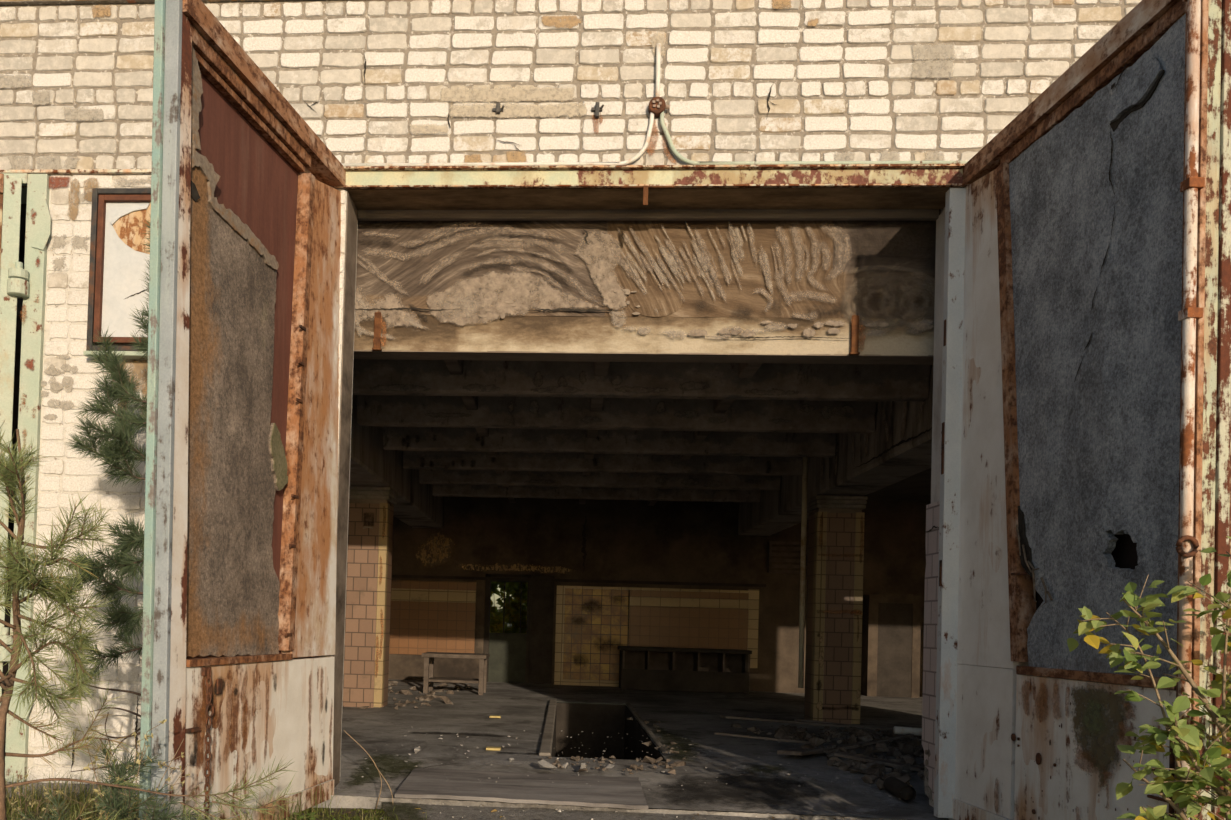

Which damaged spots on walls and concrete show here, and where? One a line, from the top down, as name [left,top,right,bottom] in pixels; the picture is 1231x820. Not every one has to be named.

spalling [427,231,650,334]
peeling [665,320,845,339]
crack [1074,129,1115,382]
corrosion [200,671,269,786]
corrosion [309,669,332,770]
corrosion [1022,681,1070,721]